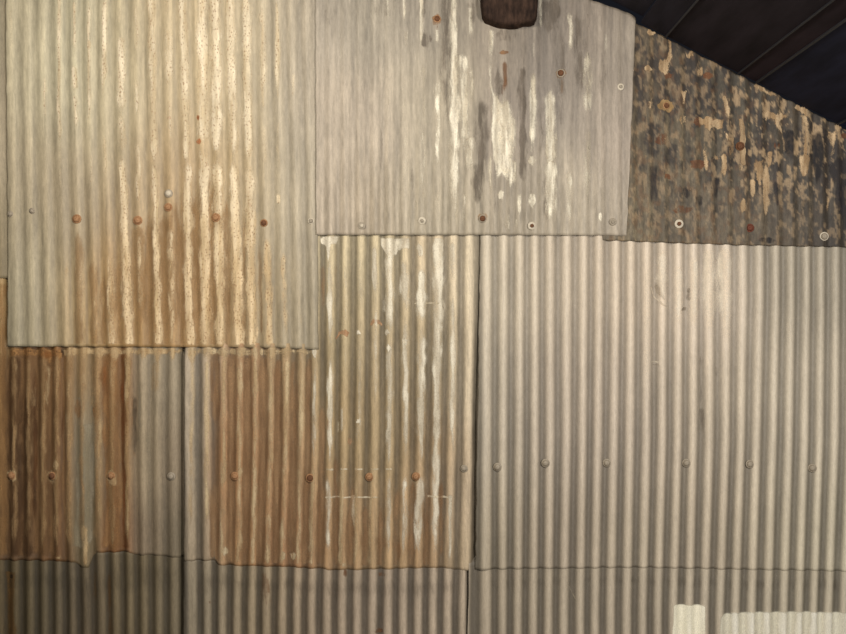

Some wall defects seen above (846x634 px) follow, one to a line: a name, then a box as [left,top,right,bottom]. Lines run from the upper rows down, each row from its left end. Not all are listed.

peeling [645,40,672,75]
leakage [474,105,486,198]
peeling [699,96,772,214]
peeling [765,110,787,150]
peeling [795,105,810,176]
corrosion [0,325,65,555]
corrosion [93,357,127,550]
corrosion [214,359,324,563]